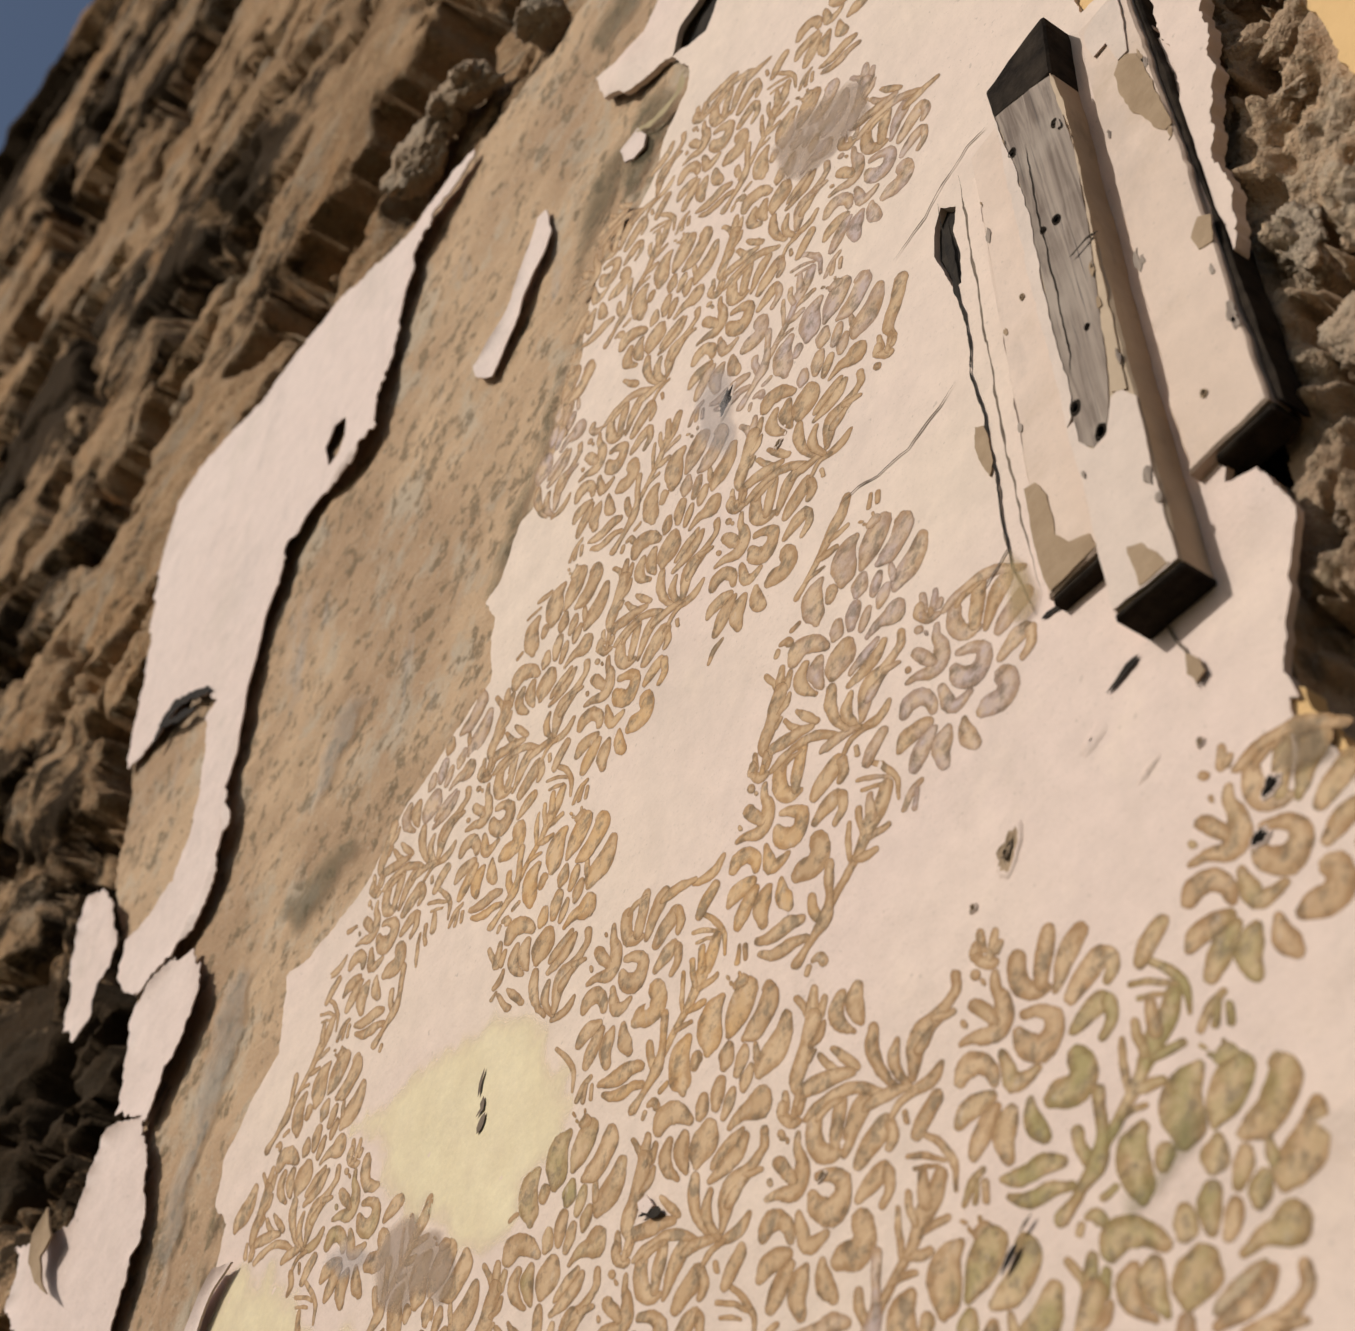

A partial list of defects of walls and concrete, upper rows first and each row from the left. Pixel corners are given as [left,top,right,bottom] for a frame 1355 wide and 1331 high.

peeling [1114,49,1172,141]
flaking render [620,128,647,163]
flaking render [473,210,552,379]
peeling [1133,248,1146,272]
peeling [1191,214,1214,250]
peeling [1226,300,1241,329]
crack [840,128,1060,619]
peeling [1024,483,1096,591]
peeling [1127,542,1170,586]
flaking render [5,150,476,1331]
spalling [475,1068,485,1134]
damp [366,1021,564,1305]